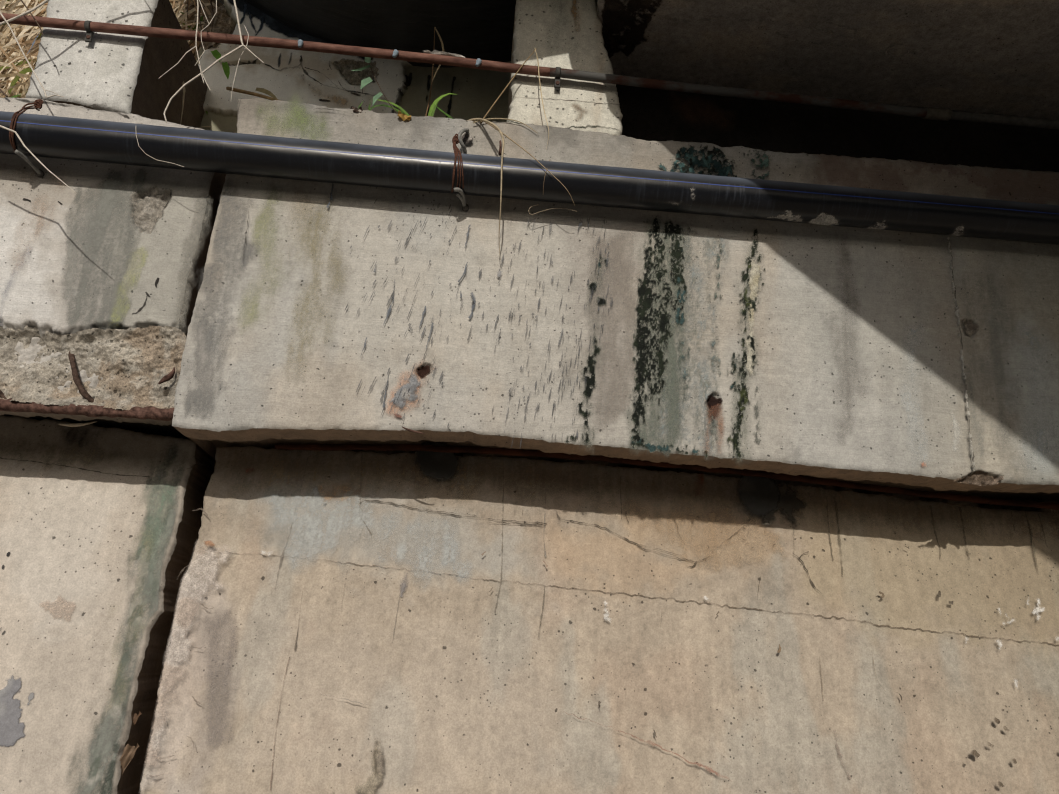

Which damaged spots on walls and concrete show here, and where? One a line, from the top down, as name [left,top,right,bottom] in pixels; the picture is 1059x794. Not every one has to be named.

spalling [0,326,186,421]
damp [565,218,708,458]
rust [709,404,723,431]
damp [727,229,765,458]
crack [360,500,740,567]
crack [794,552,816,588]